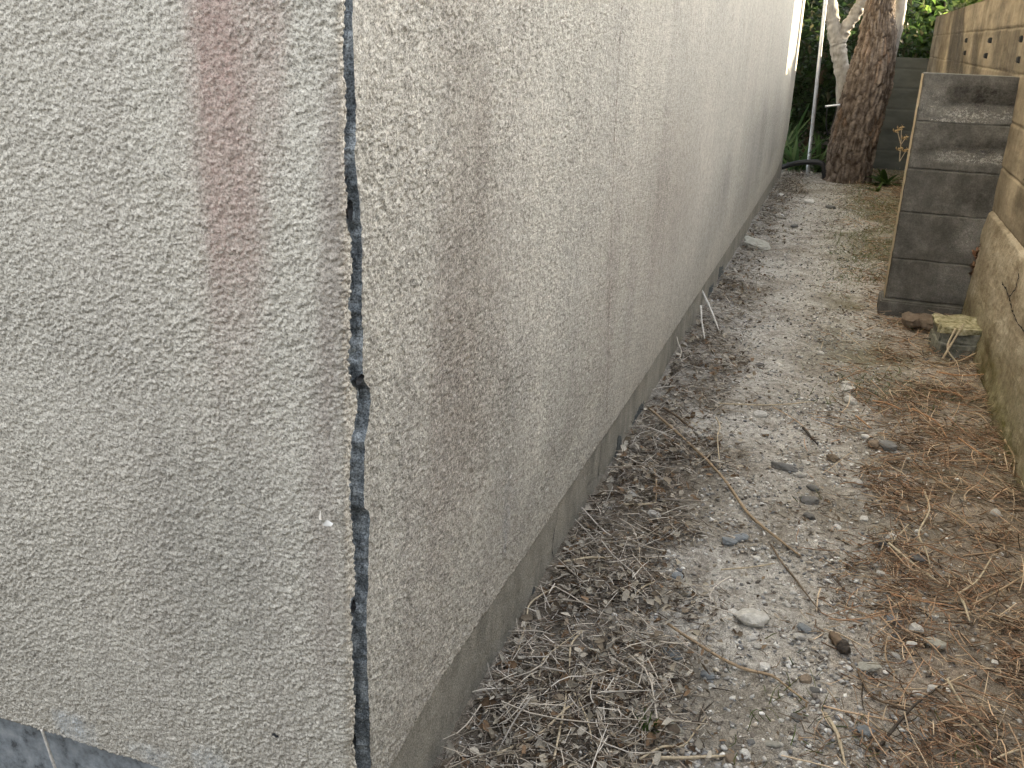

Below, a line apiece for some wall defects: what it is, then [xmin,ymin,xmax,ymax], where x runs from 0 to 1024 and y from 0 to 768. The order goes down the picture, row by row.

crack [342,0,371,768]